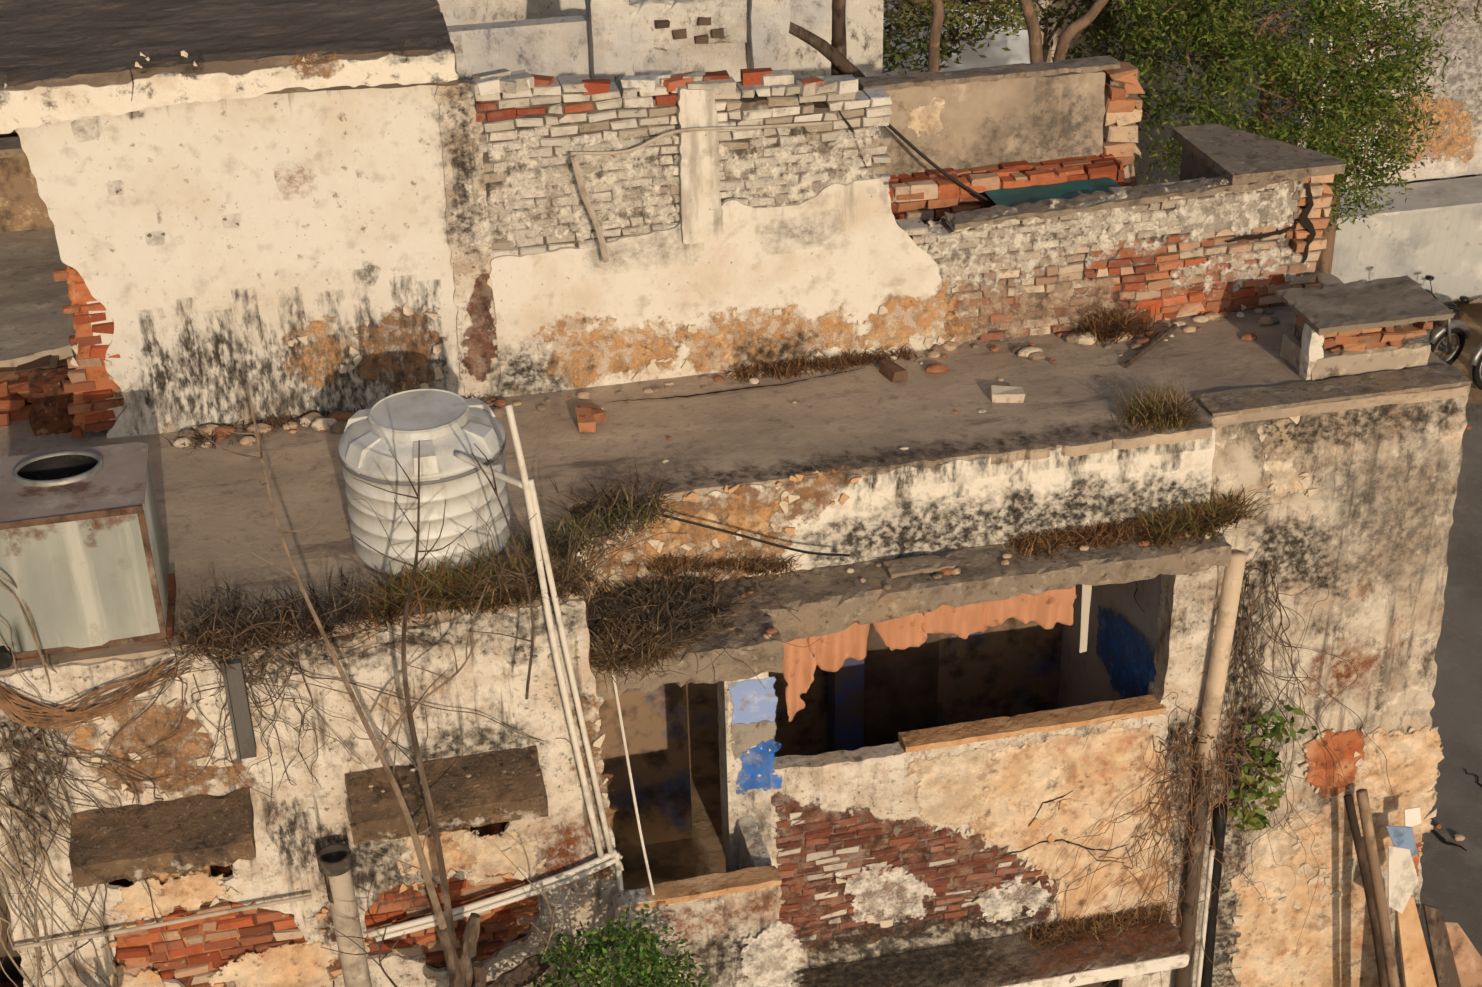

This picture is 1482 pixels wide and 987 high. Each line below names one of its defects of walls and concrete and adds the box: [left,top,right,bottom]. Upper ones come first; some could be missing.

flaking render [465,125,677,250]
flaking render [719,117,889,208]
leakage [133,281,446,426]
flaking render [283,266,498,393]
flaking render [534,180,1310,387]
leakage [592,422,1213,568]
flaking render [57,699,254,800]
flaking render [105,871,342,987]
flaking render [364,829,547,964]
flaking render [727,677,1176,953]
flaking render [1229,726,1444,987]